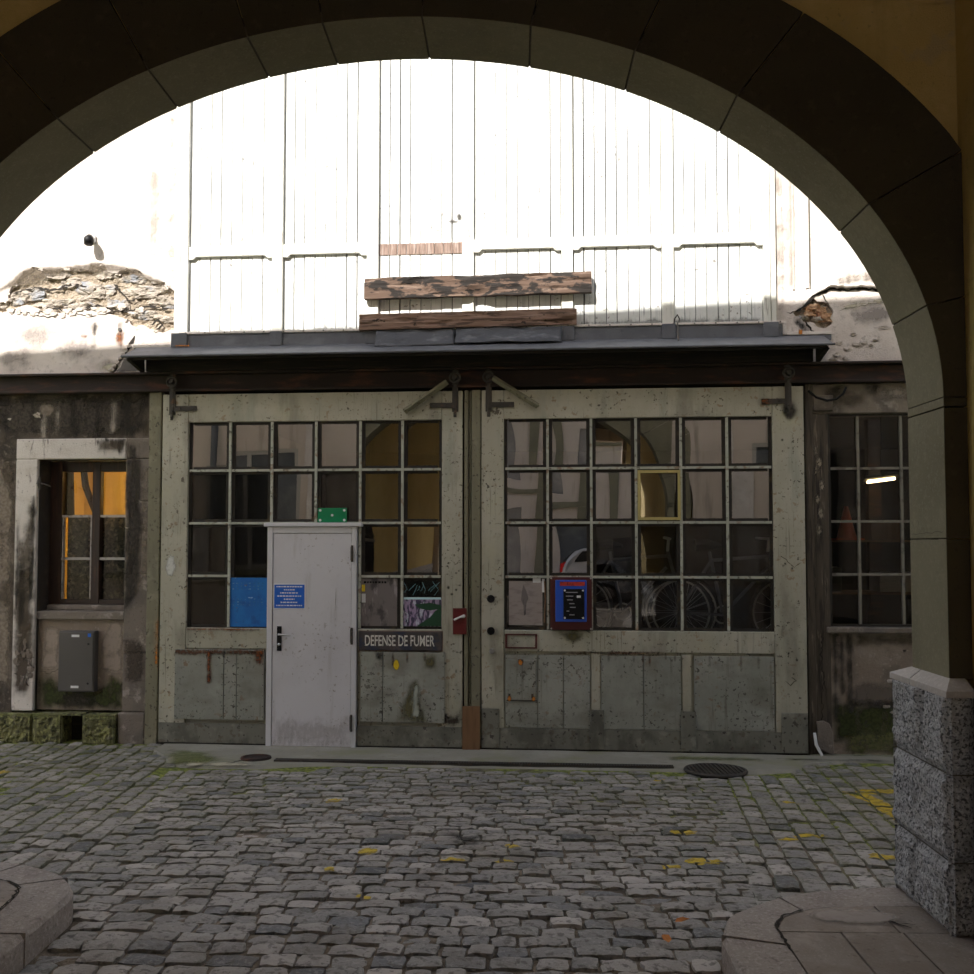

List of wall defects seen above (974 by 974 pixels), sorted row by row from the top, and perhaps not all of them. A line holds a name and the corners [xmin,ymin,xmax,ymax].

spalling [0,263,174,333]
spalling [793,300,833,331]
peeling [828,308,891,361]
damp [0,393,149,605]
damp [0,460,35,682]
rust [175,649,263,664]
crack [0,879,21,909]
crack [775,909,803,953]